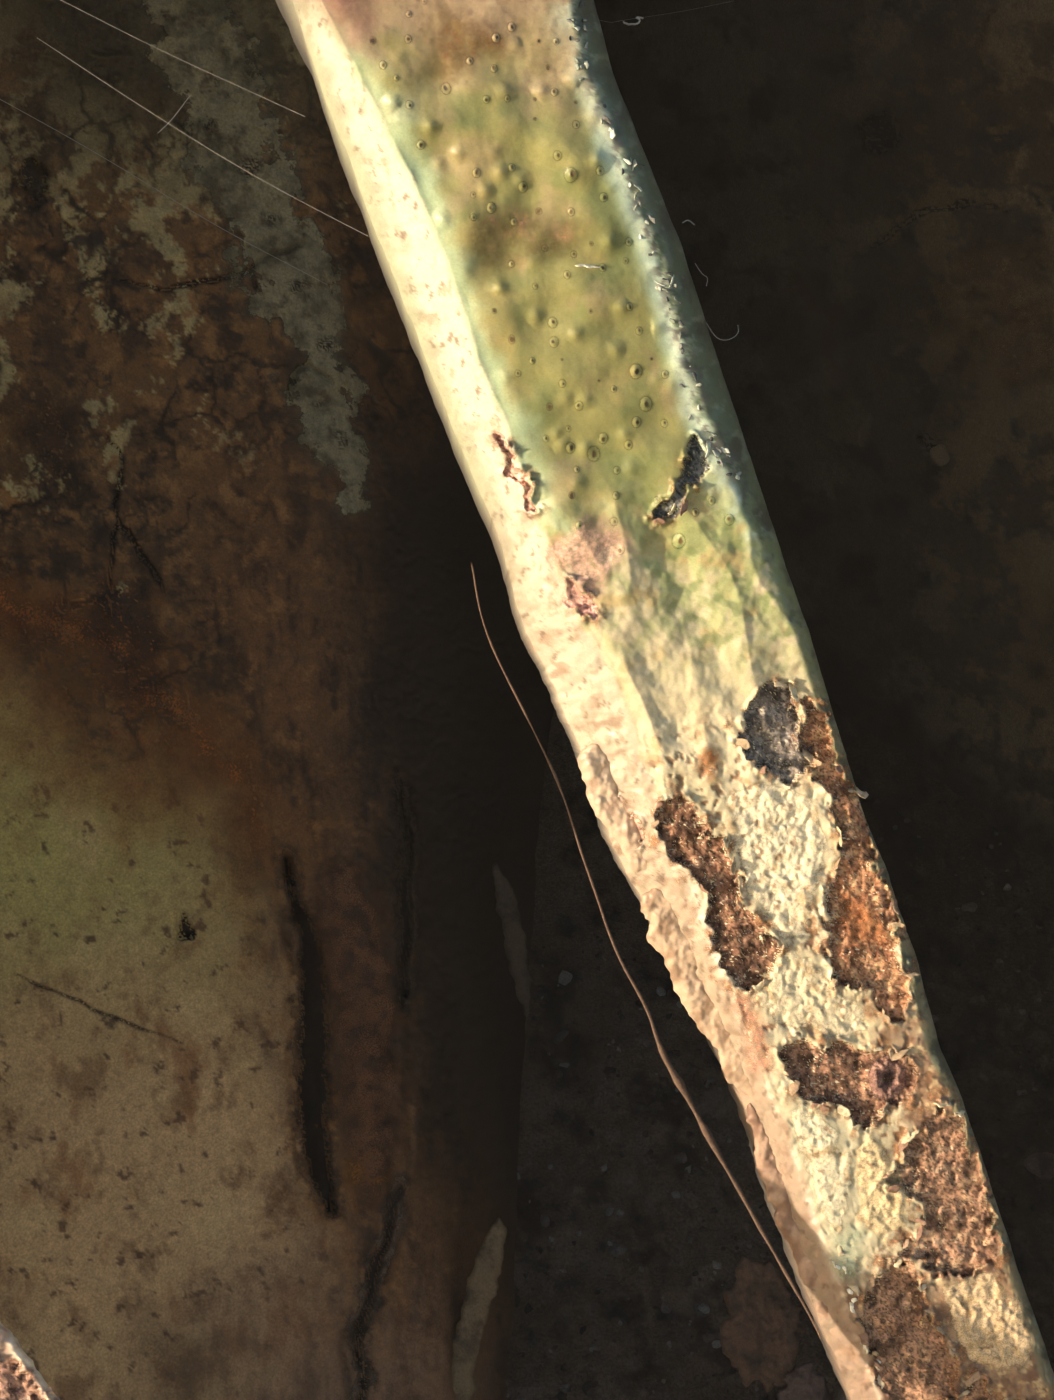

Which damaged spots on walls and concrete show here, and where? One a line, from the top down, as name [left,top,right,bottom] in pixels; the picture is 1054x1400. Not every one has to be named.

peeling [600,104,616,139]
peeling [622,157,656,256]
crack [112,265,272,340]
peeling [706,431,742,480]
crack [106,437,163,605]
peeling [653,500,688,525]
rust [845,896,882,940]
crack [274,846,346,1219]
spalling [724,679,1025,1400]
crack [343,1175,411,1400]
rust [0,1322,60,1400]
rust [829,1380,847,1400]